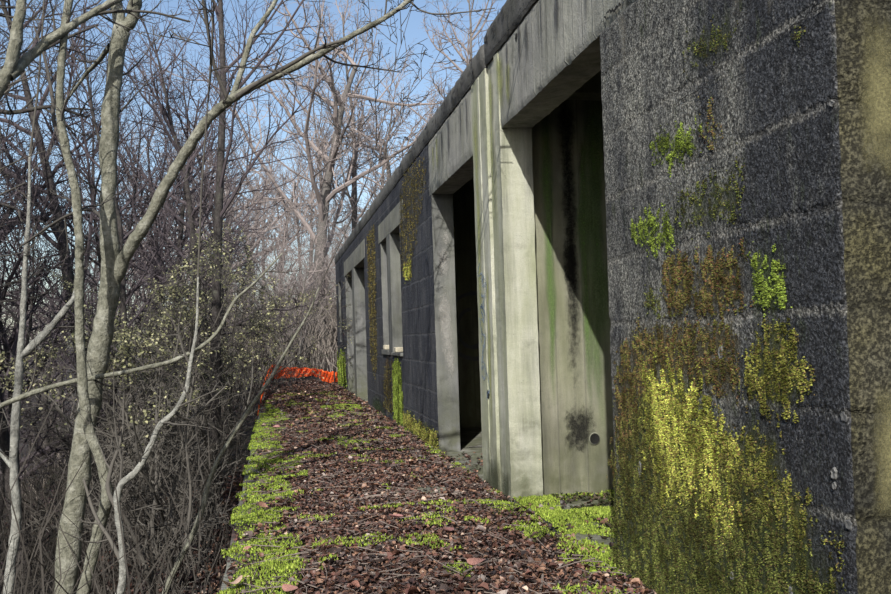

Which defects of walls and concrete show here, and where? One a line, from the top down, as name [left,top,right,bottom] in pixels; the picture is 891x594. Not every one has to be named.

damp [489,43,509,183]
damp [542,103,607,360]
damp [566,413,592,451]